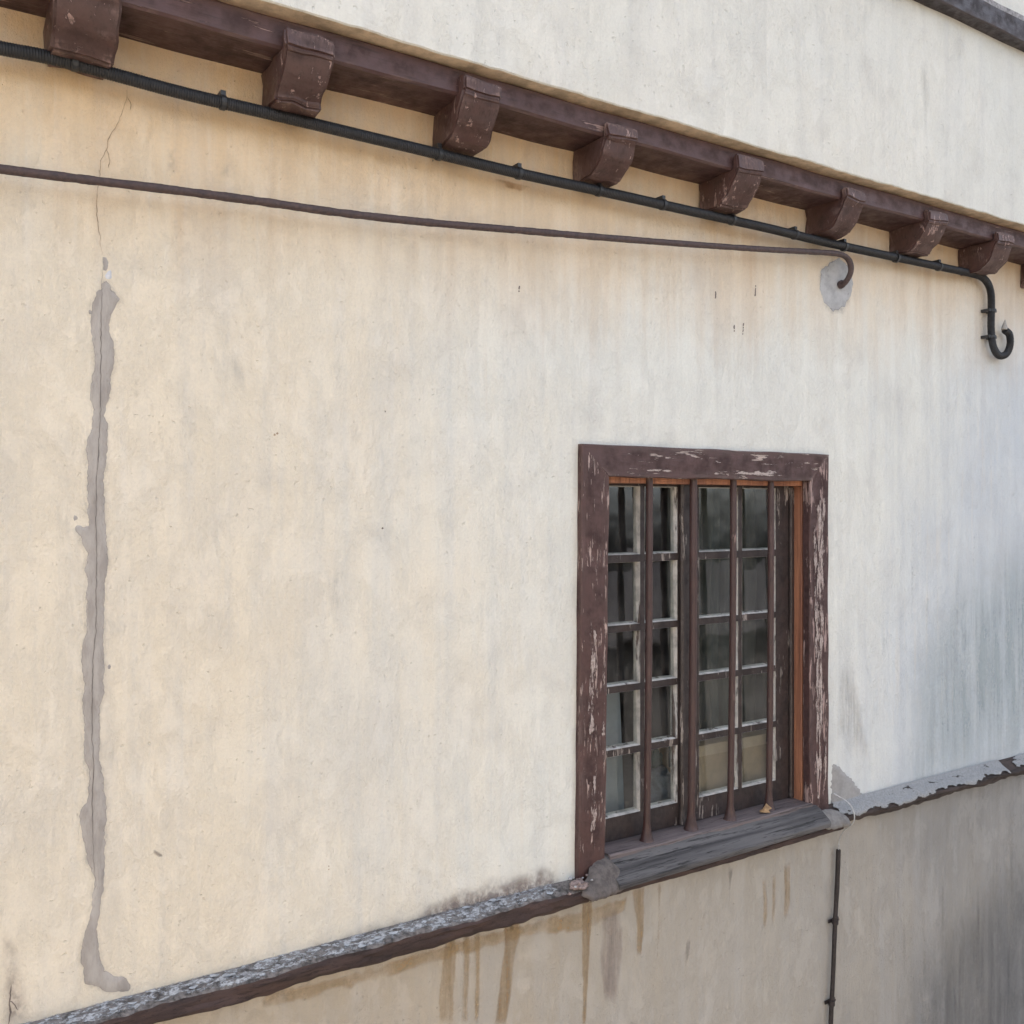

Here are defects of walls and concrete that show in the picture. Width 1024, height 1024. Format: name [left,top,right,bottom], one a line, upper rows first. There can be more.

crack [91,97,131,889]
spalling [832,754,1024,816]